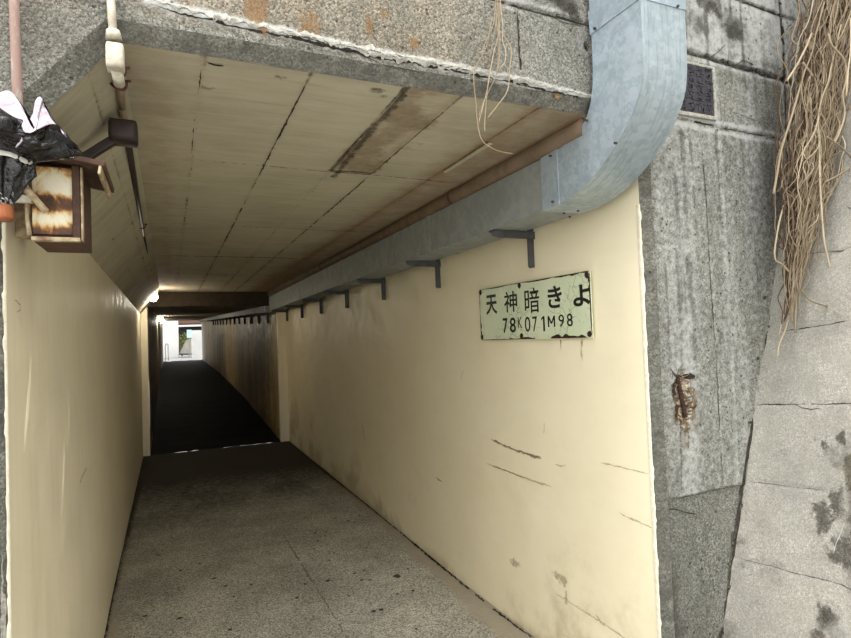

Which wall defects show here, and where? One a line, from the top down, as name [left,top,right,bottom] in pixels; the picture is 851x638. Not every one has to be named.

rust [243,0,267,35]
crack [150,0,589,99]
leakage [330,88,407,177]
crack [751,185,847,360]
crack [669,403,851,638]
leakage [813,455,851,568]